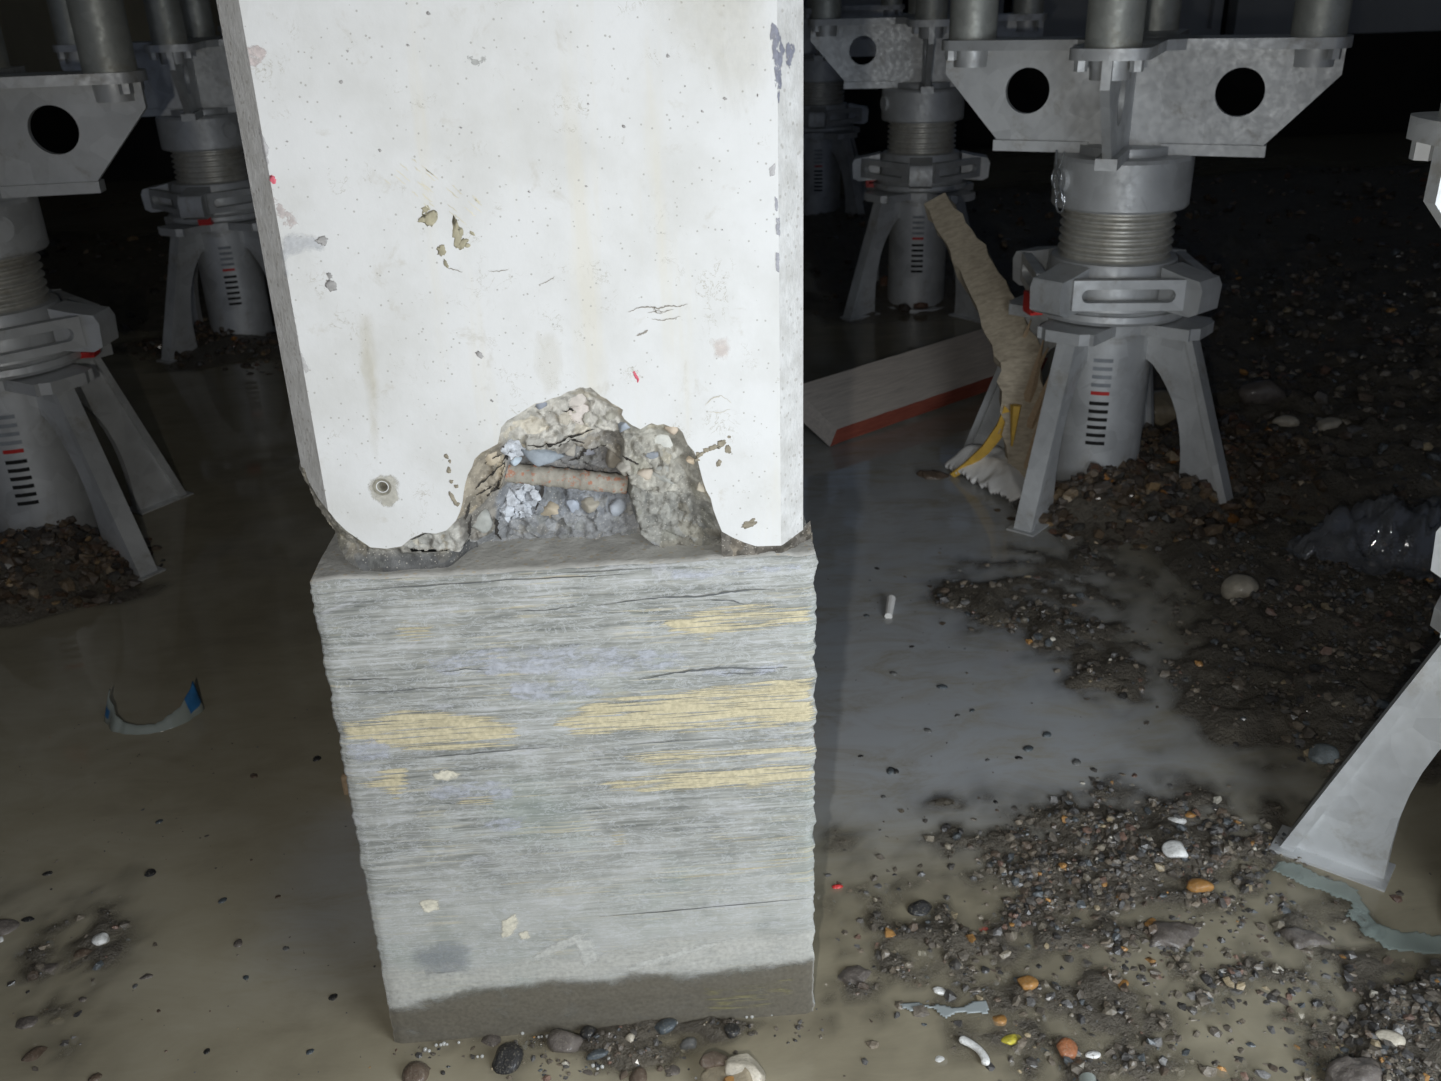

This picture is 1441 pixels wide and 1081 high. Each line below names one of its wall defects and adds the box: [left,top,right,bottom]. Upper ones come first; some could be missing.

spalling [299,387,722,572]
damp [501,915,530,939]
damp [384,933,815,1044]